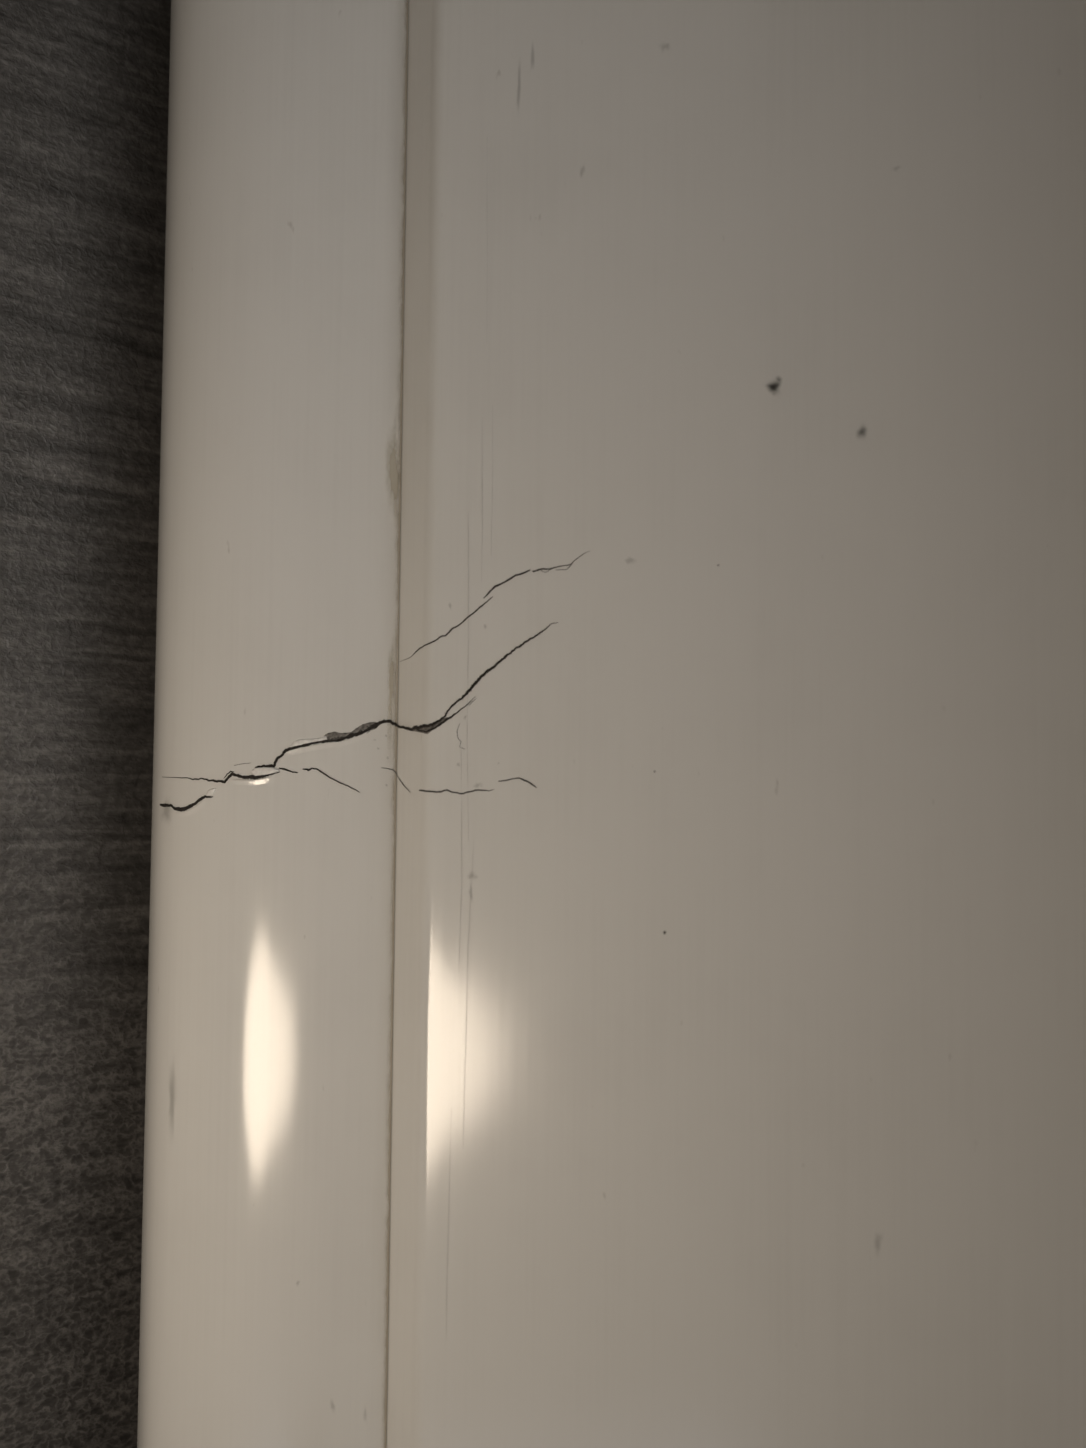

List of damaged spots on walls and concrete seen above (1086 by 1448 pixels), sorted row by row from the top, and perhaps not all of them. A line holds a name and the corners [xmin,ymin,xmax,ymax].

crack [402,551,589,661]
crack [160,623,554,818]